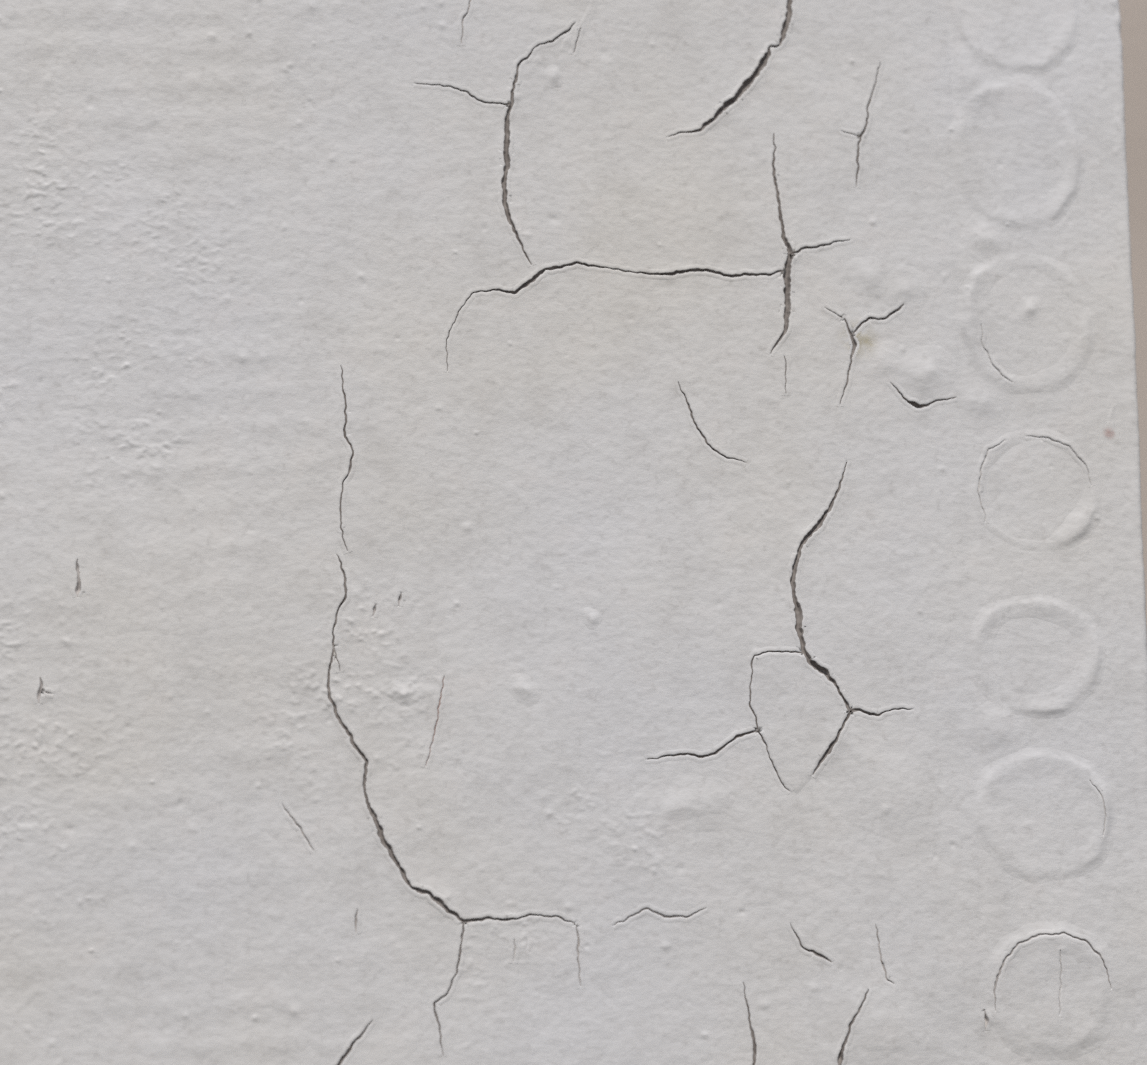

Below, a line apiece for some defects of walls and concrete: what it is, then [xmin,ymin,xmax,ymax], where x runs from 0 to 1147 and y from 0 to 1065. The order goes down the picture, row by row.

crack [839,59,885,189]
crack [413,0,853,396]
crack [673,379,748,467]
crack [823,300,907,407]
crack [887,379,958,413]
crack [644,459,914,796]
crack [322,363,586,1057]
crack [610,903,709,930]
crack [330,1017,377,1065]